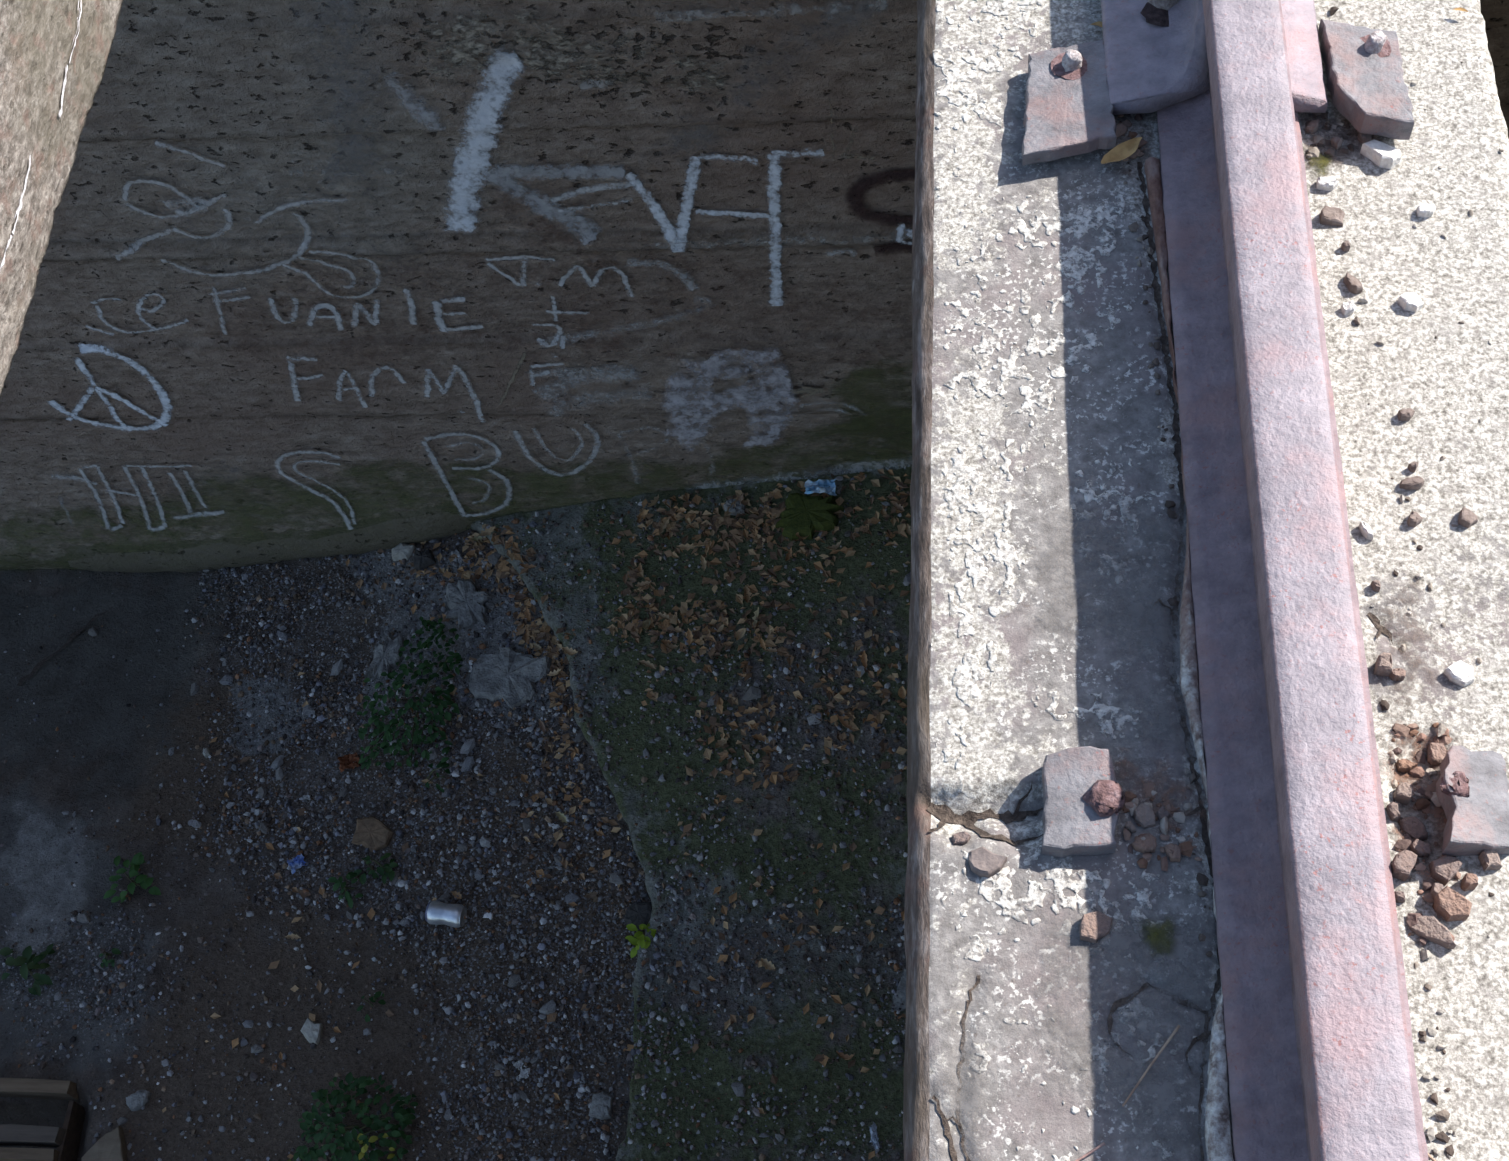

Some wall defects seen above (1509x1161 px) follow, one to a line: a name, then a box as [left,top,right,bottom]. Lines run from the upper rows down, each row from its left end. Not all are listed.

corrosion [1051,53,1087,80]
corrosion [1360,35,1391,58]
crack [926,783,1043,845]
corrosion [1392,735,1448,883]
crack [932,975,980,1161]